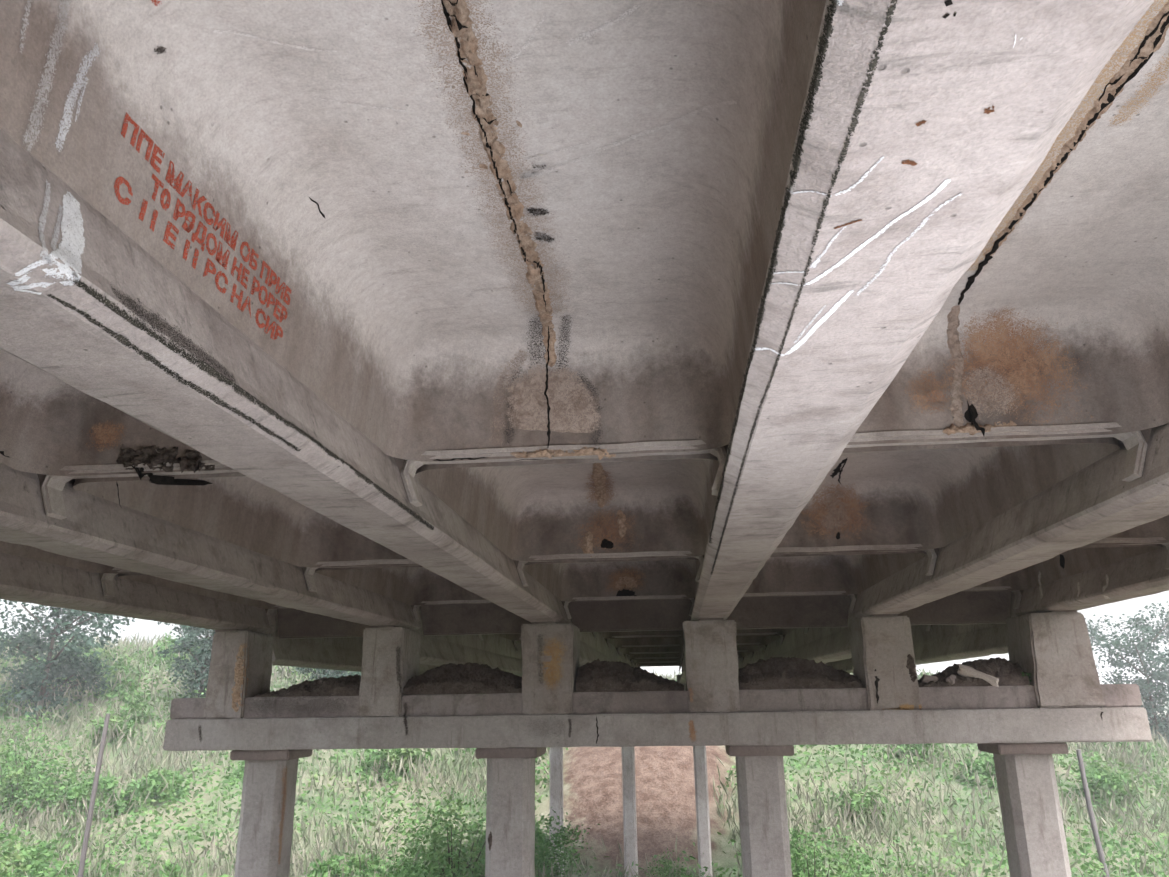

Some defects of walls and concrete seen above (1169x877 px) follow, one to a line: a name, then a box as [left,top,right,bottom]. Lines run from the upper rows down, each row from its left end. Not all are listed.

water stain [23,0,71,152]
water stain [55,43,100,152]
crack [410,0,572,324]
crack [958,0,1169,305]
water stain [490,314,603,459]
spalling [116,445,215,486]
corrosion [571,463,643,557]